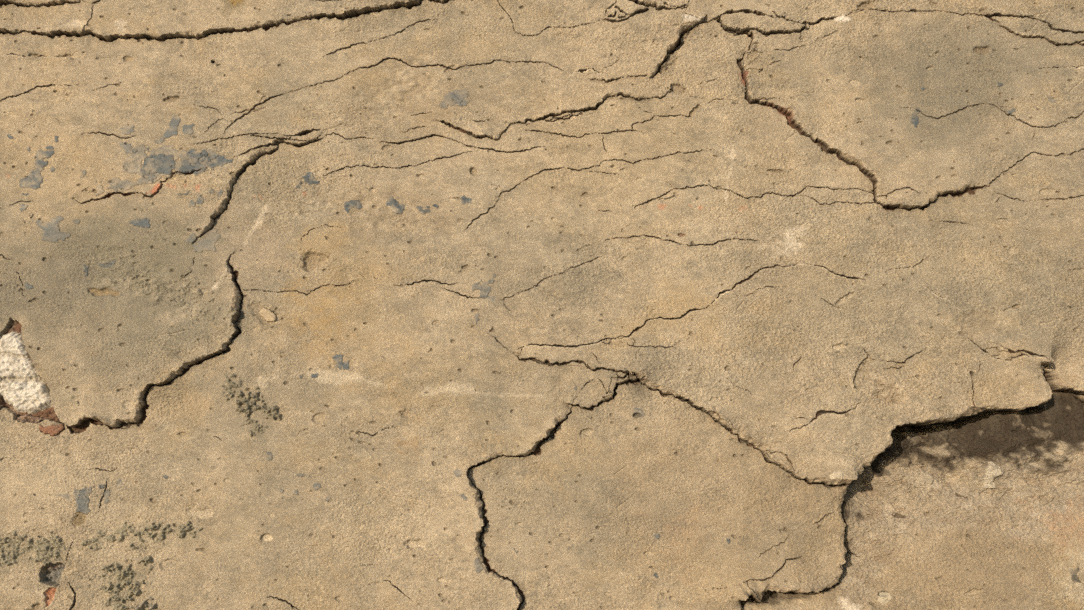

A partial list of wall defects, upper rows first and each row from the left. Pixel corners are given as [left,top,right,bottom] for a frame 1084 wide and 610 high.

crack [0,0,1084,434]
flaking render [0,320,65,436]
crack [468,256,942,610]
spalling [853,354,875,391]
spalling [831,383,1084,610]